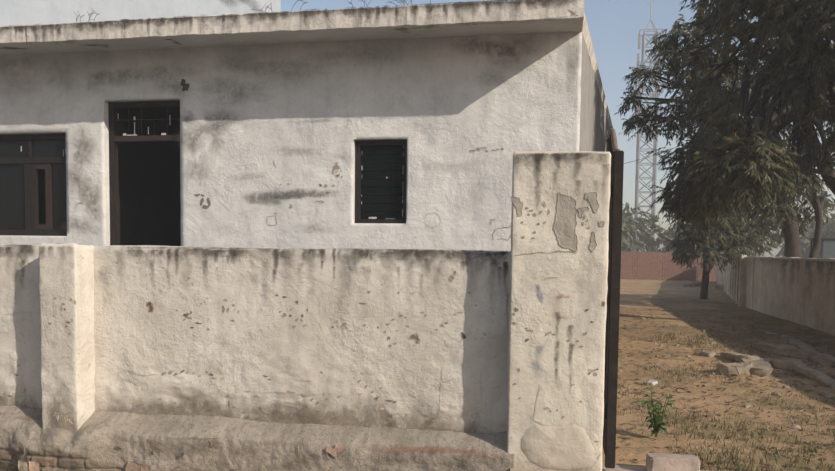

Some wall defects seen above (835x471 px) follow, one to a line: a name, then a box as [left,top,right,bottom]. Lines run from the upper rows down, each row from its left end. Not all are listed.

damp [248,5,397,21]
damp [412,0,552,14]
flaking render [510,192,605,252]
damp [161,247,245,261]
damp [380,249,508,276]
crack [492,226,575,256]